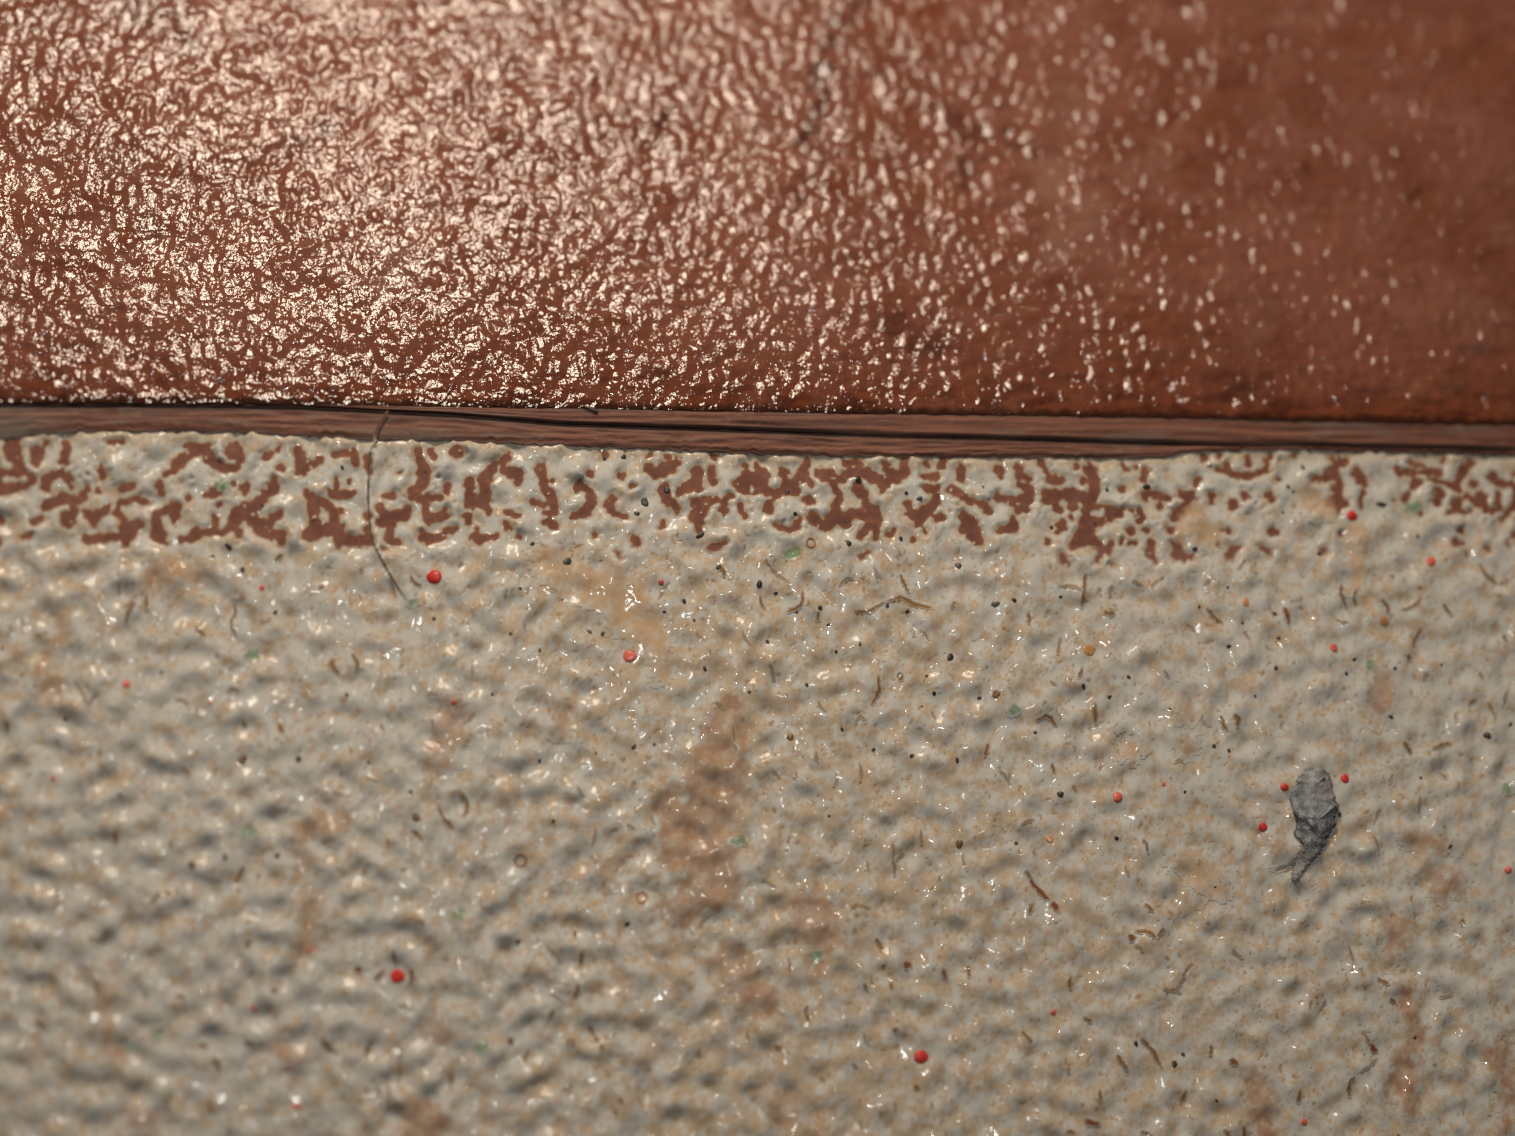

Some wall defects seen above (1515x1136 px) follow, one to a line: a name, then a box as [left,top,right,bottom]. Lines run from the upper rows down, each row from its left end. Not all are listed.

crack [366,410,417,601]
peeling [0,438,1281,545]
peeling [1313,455,1368,514]
peeling [1392,457,1515,545]